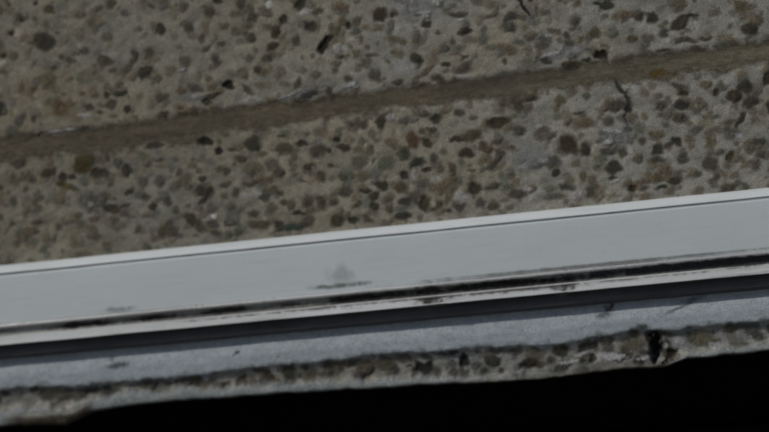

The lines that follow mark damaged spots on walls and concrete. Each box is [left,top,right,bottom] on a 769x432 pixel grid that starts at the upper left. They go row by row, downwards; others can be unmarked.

crack [518,0,530,15]
crack [614,80,631,137]
spalling [560,350,626,364]
spalling [637,332,684,365]